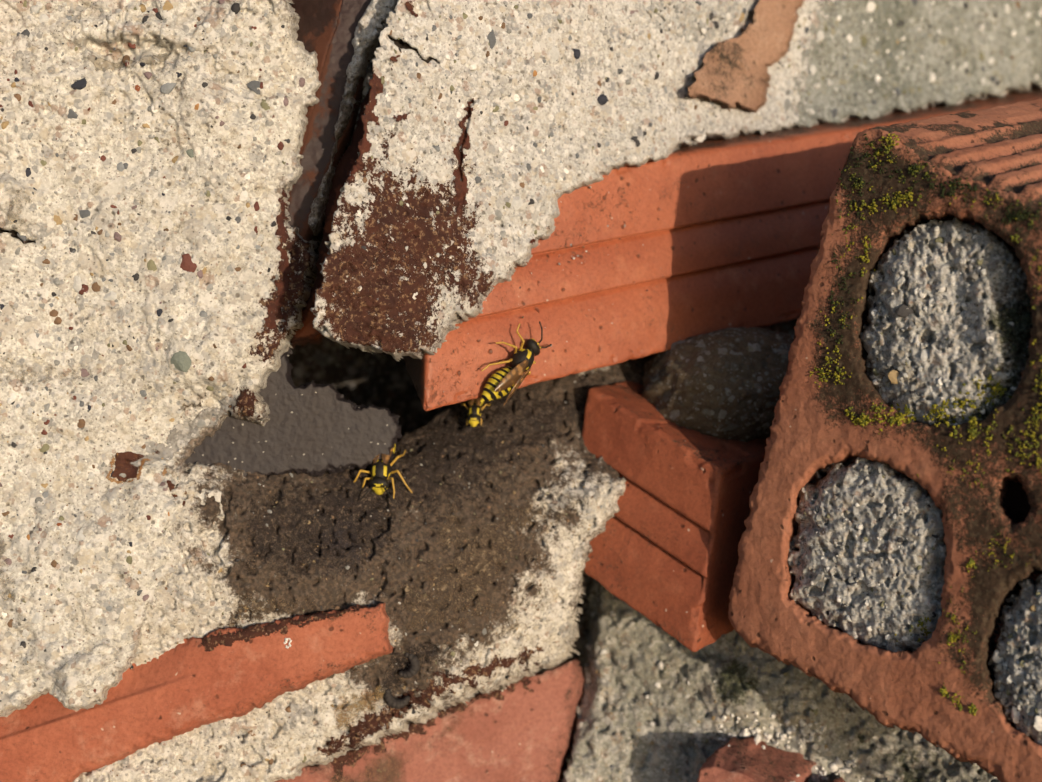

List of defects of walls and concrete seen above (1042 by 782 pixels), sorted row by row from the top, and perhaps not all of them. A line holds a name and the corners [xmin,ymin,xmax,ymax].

crack [351,35,437,142]
crack [0,229,36,244]
water stain [214,371,617,632]
water stain [335,686,385,728]